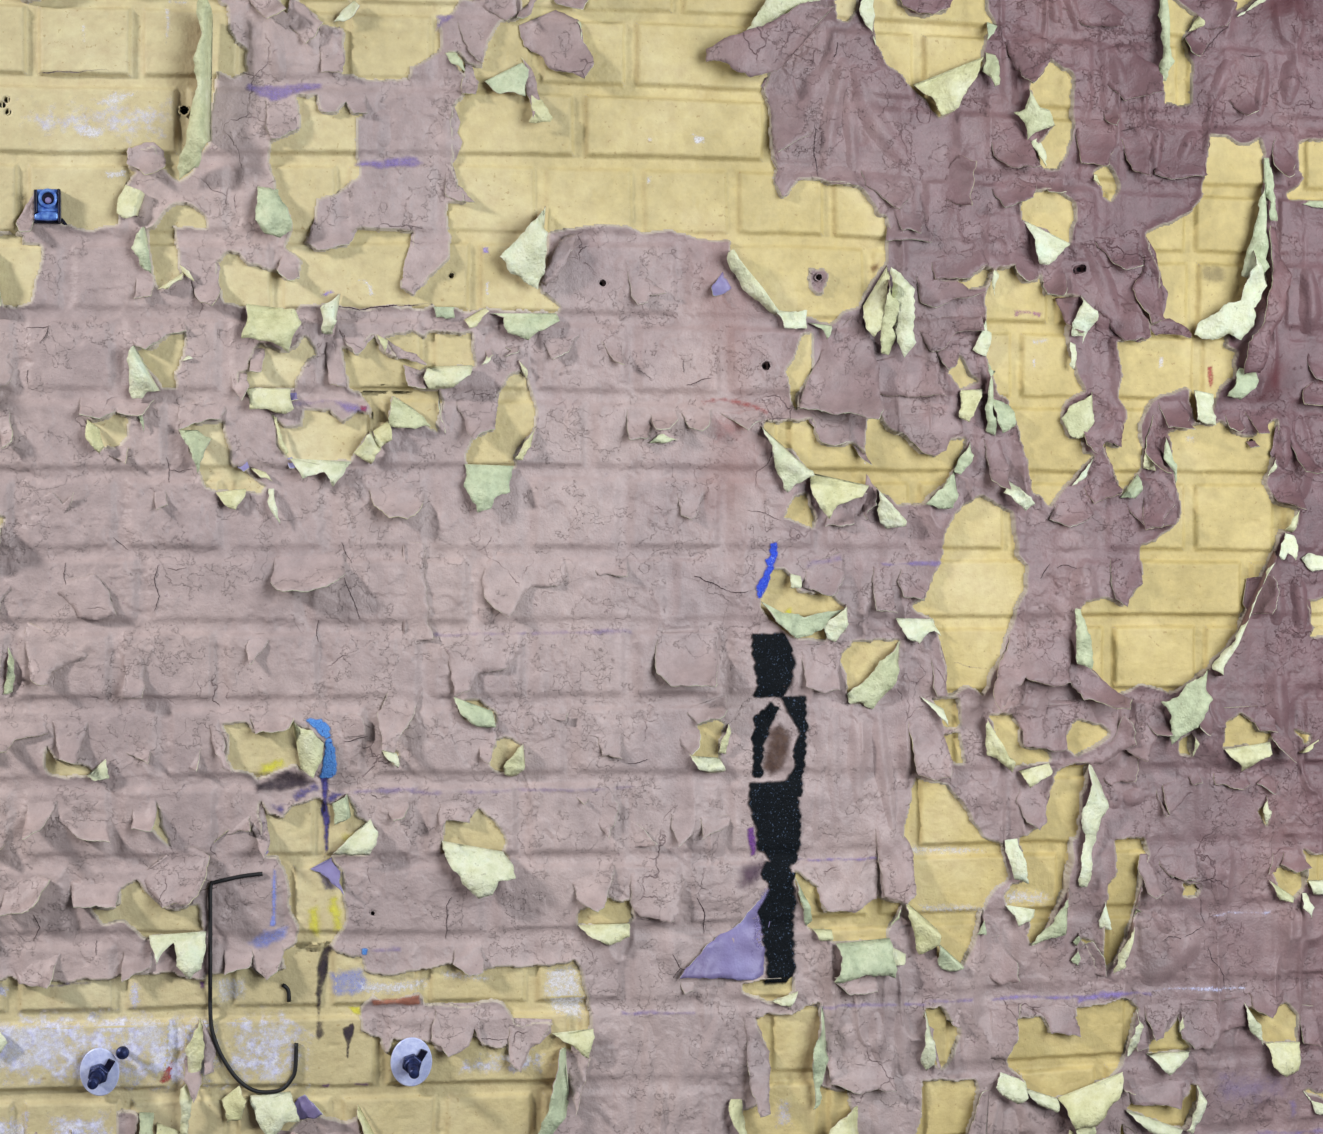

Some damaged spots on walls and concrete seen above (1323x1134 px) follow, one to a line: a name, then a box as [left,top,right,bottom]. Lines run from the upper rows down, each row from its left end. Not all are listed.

peeling [0,0,246,307]
peeling [79,322,193,464]
peeling [131,0,1323,995]
peeling [0,721,109,781]
peeling [0,794,595,1134]
peeling [679,892,897,1134]
peeling [916,988,1323,1134]